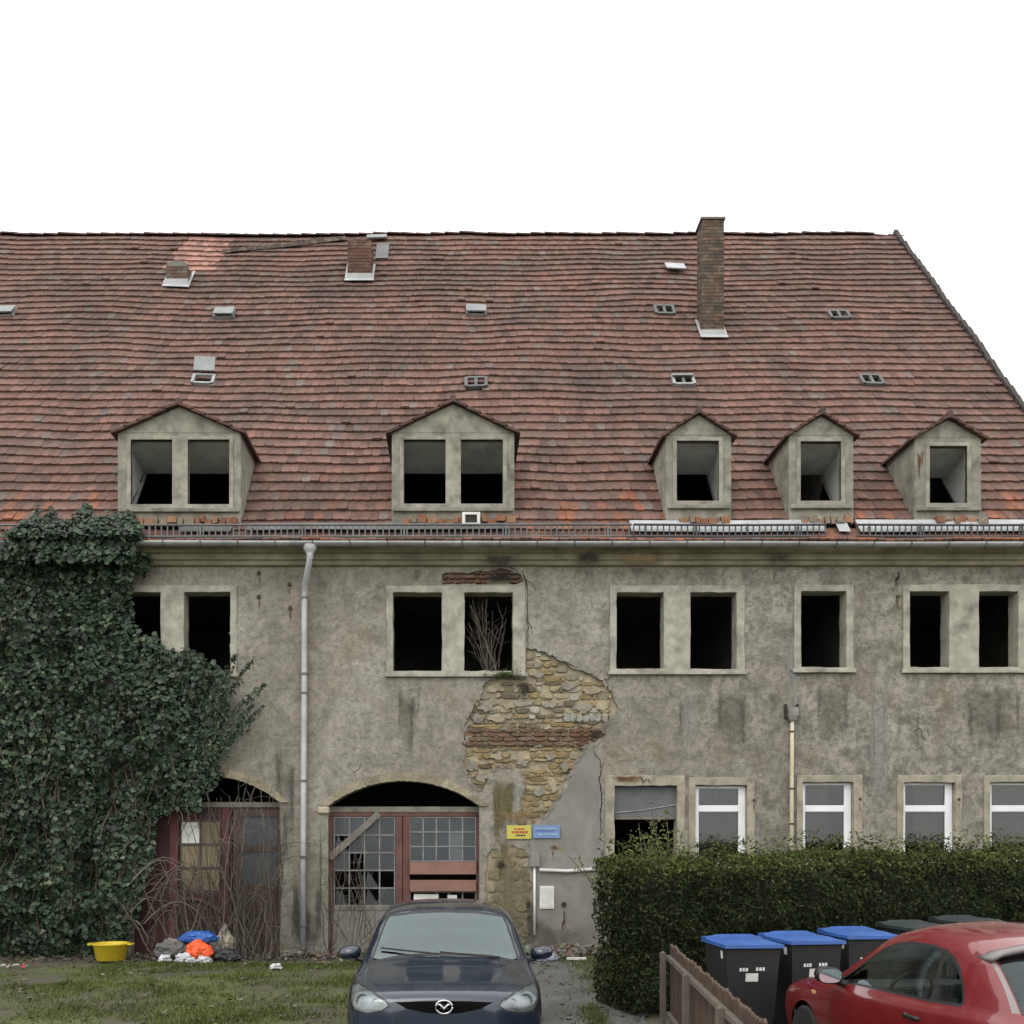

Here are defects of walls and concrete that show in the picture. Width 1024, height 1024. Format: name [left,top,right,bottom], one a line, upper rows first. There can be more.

flaking render [440,571,522,584]
crack [510,567,610,686]
flaking render [461,646,621,826]
crack [593,749,604,842]
flaking render [485,845,532,943]